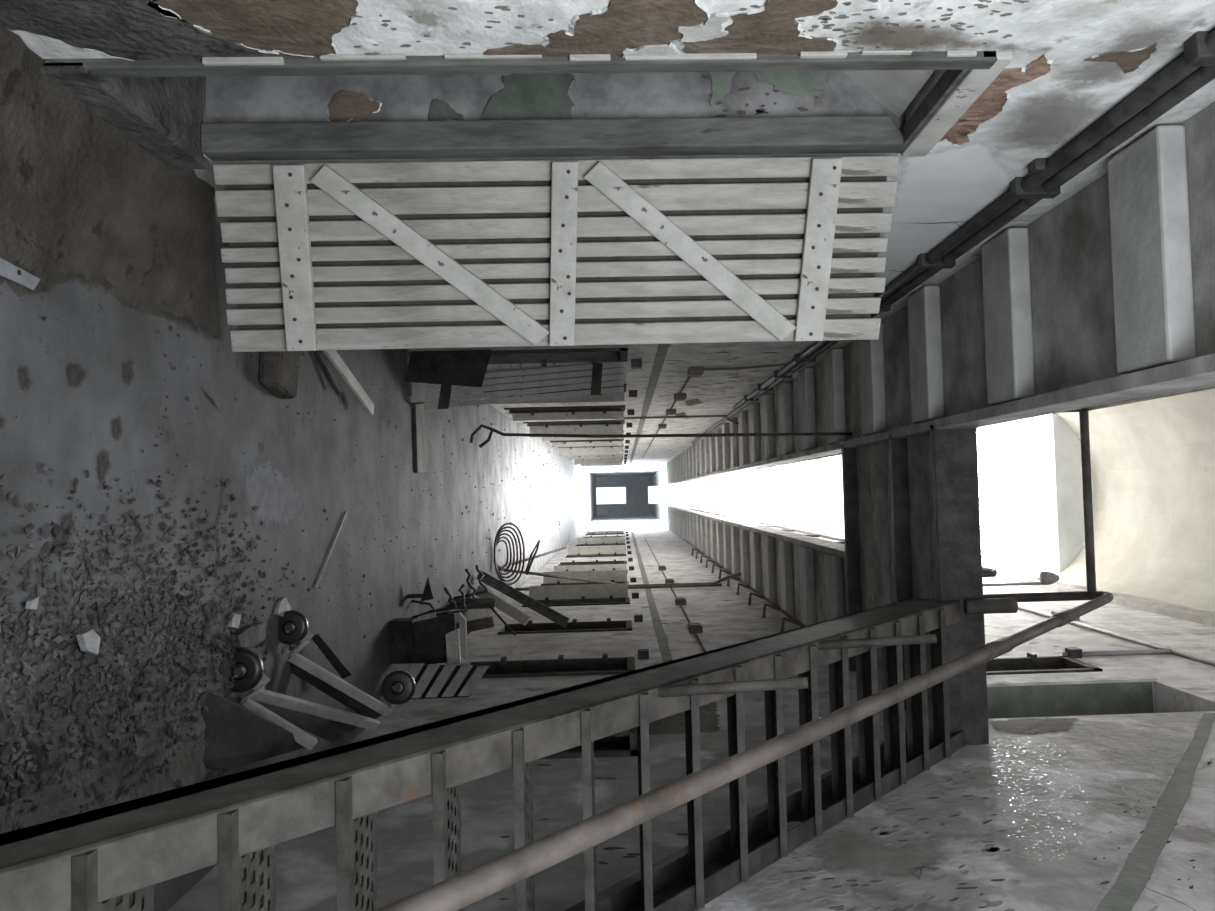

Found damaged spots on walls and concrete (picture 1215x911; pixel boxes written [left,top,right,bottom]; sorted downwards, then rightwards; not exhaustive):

spalling [0,0,363,61]
spalling [483,0,1030,58]
spalling [1084,42,1157,74]
peeling [427,99,464,121]
peeling [480,73,576,120]
peeling [702,71,828,118]
spalling [938,55,1054,147]
peeling [836,763,1011,853]
water stain [986,718,1092,861]
peeling [782,843,1015,911]